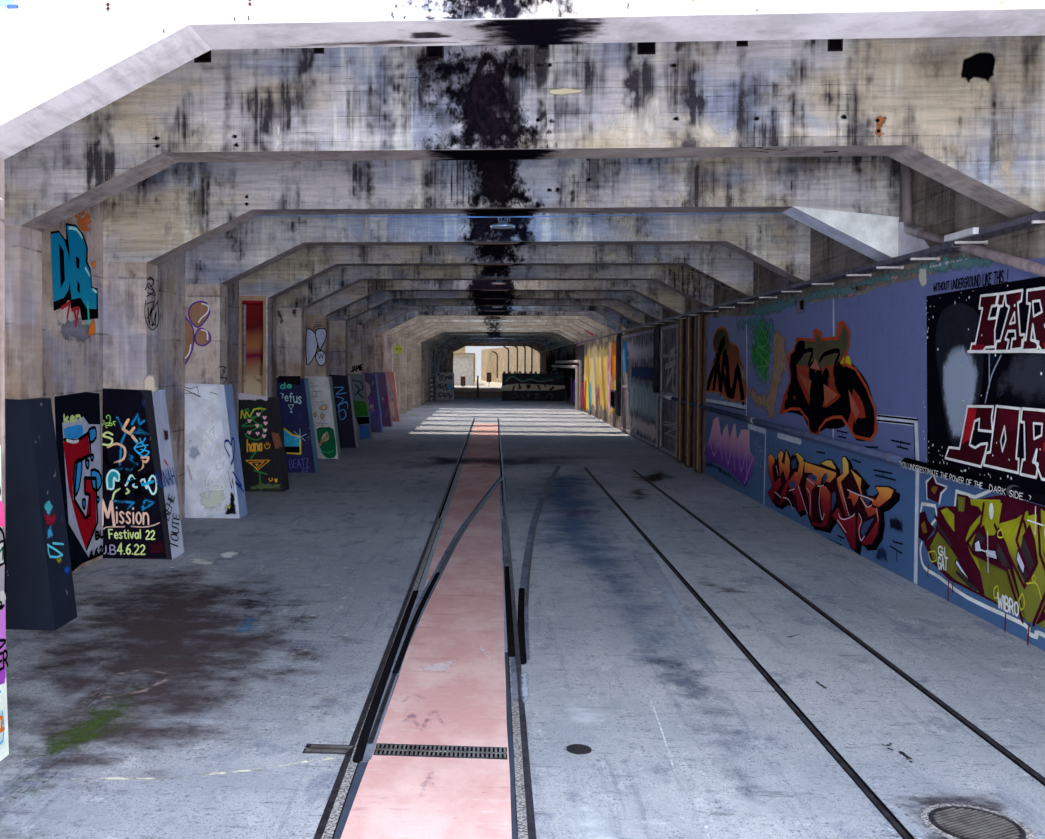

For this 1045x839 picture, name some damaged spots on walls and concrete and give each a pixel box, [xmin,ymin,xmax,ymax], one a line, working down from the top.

leakage [795,157,820,165]
leakage [34,571,282,774]